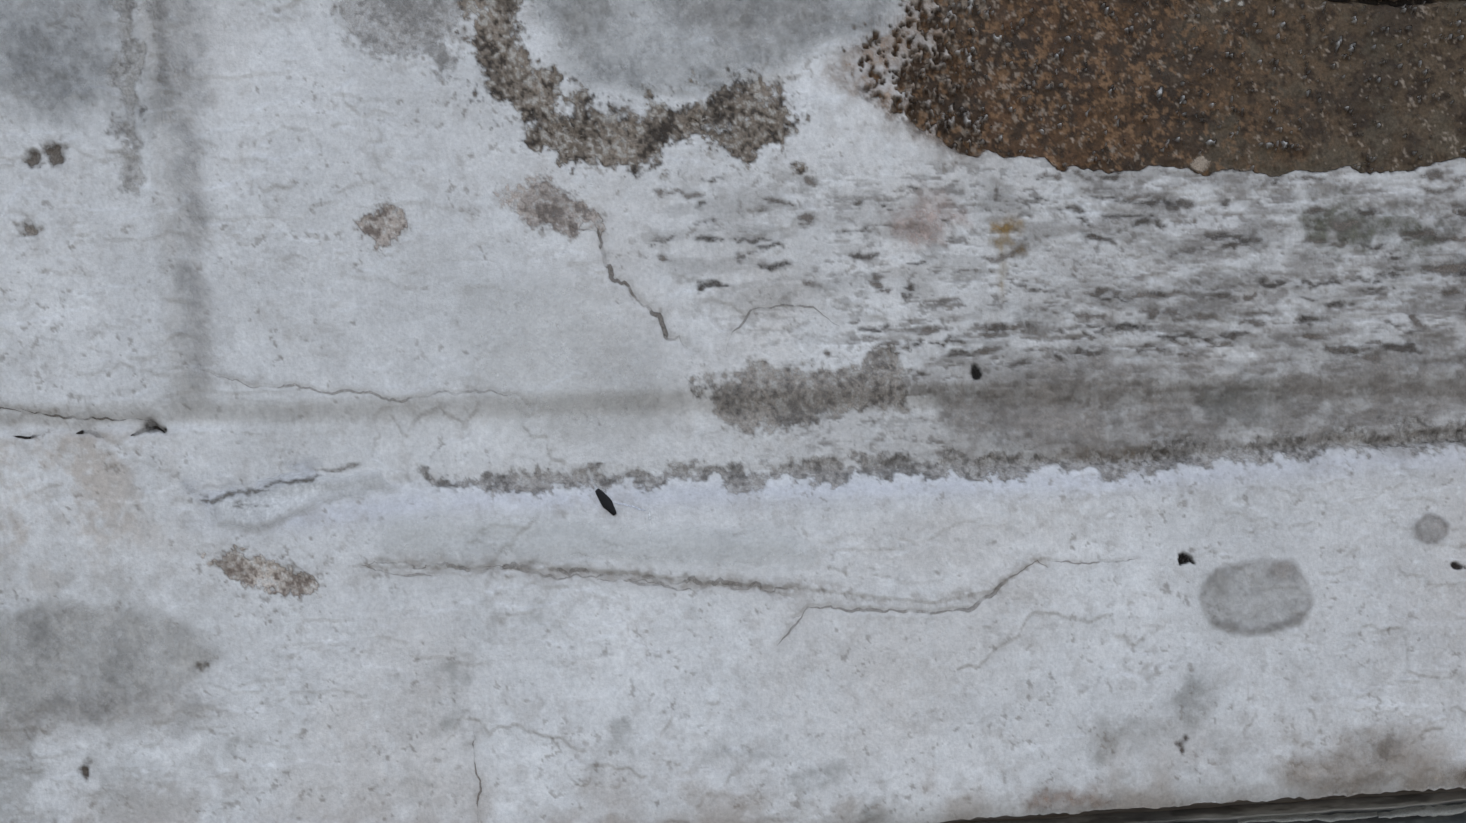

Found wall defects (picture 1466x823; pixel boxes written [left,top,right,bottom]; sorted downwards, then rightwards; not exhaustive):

spalling [331,0,816,270]
spalling [858,0,1466,247]
crack [550,213,668,340]
peeling [1170,233,1262,257]
leakage [1303,204,1433,246]
peeling [1423,263,1466,296]
spalling [690,245,1426,435]
crack [0,407,165,439]
spalling [420,416,1466,495]
spalling [201,544,319,599]
crack [362,559,1131,646]
leakage [0,606,207,711]